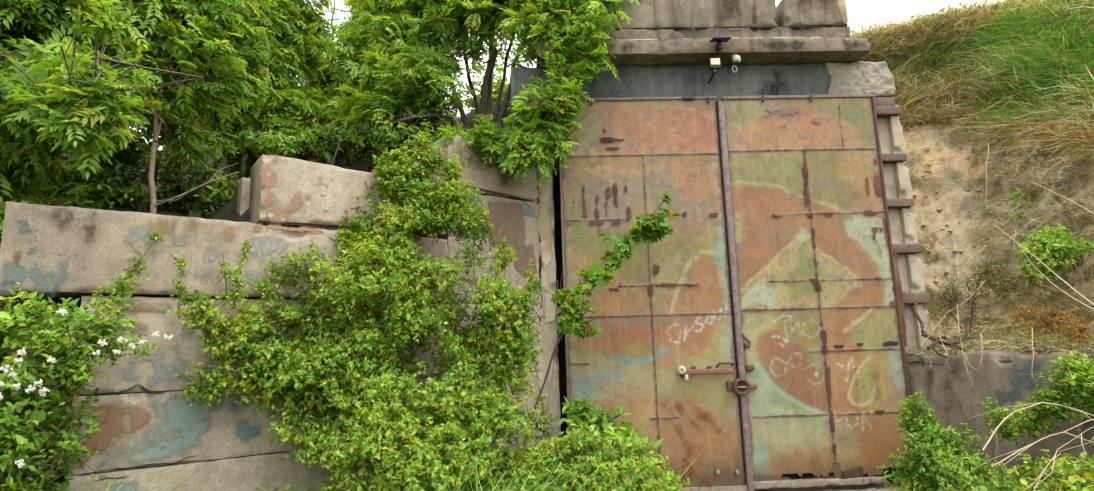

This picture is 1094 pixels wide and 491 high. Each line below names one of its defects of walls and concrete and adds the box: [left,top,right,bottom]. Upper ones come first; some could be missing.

water stain [761,71,789,95]
corrosion [600,129,634,156]
corrosion [802,168,833,292]
corrosion [647,259,696,297]
corrosion [864,210,907,350]
corrosion [817,326,844,432]
corrosion [753,445,863,482]